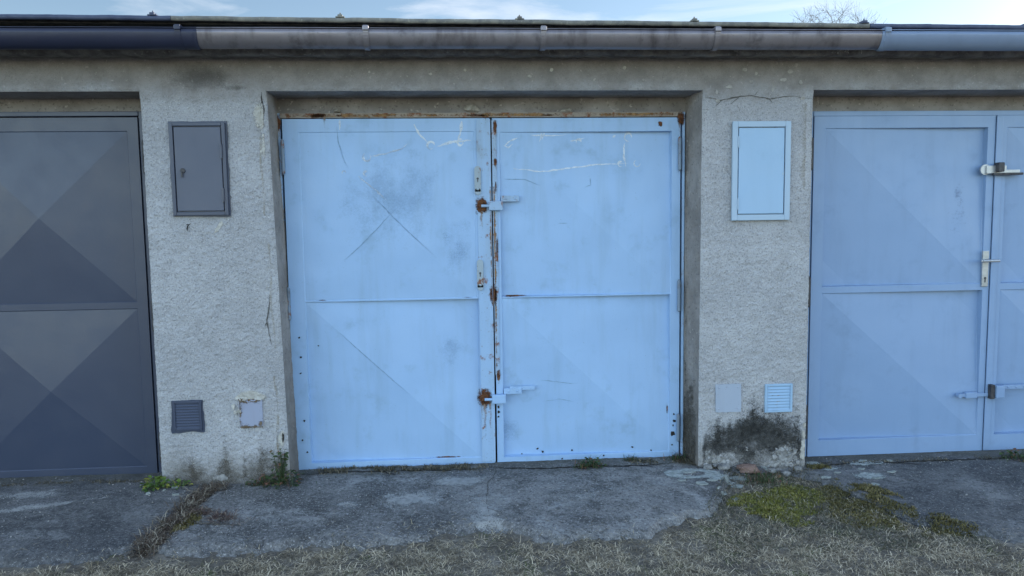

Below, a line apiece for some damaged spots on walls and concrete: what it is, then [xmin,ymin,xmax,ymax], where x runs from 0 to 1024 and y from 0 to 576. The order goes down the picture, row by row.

crack [706,94,801,106]
corrosion [420,113,556,132]
corrosion [600,113,685,126]
corrosion [476,182,526,381]
leakage [683,380,802,467]